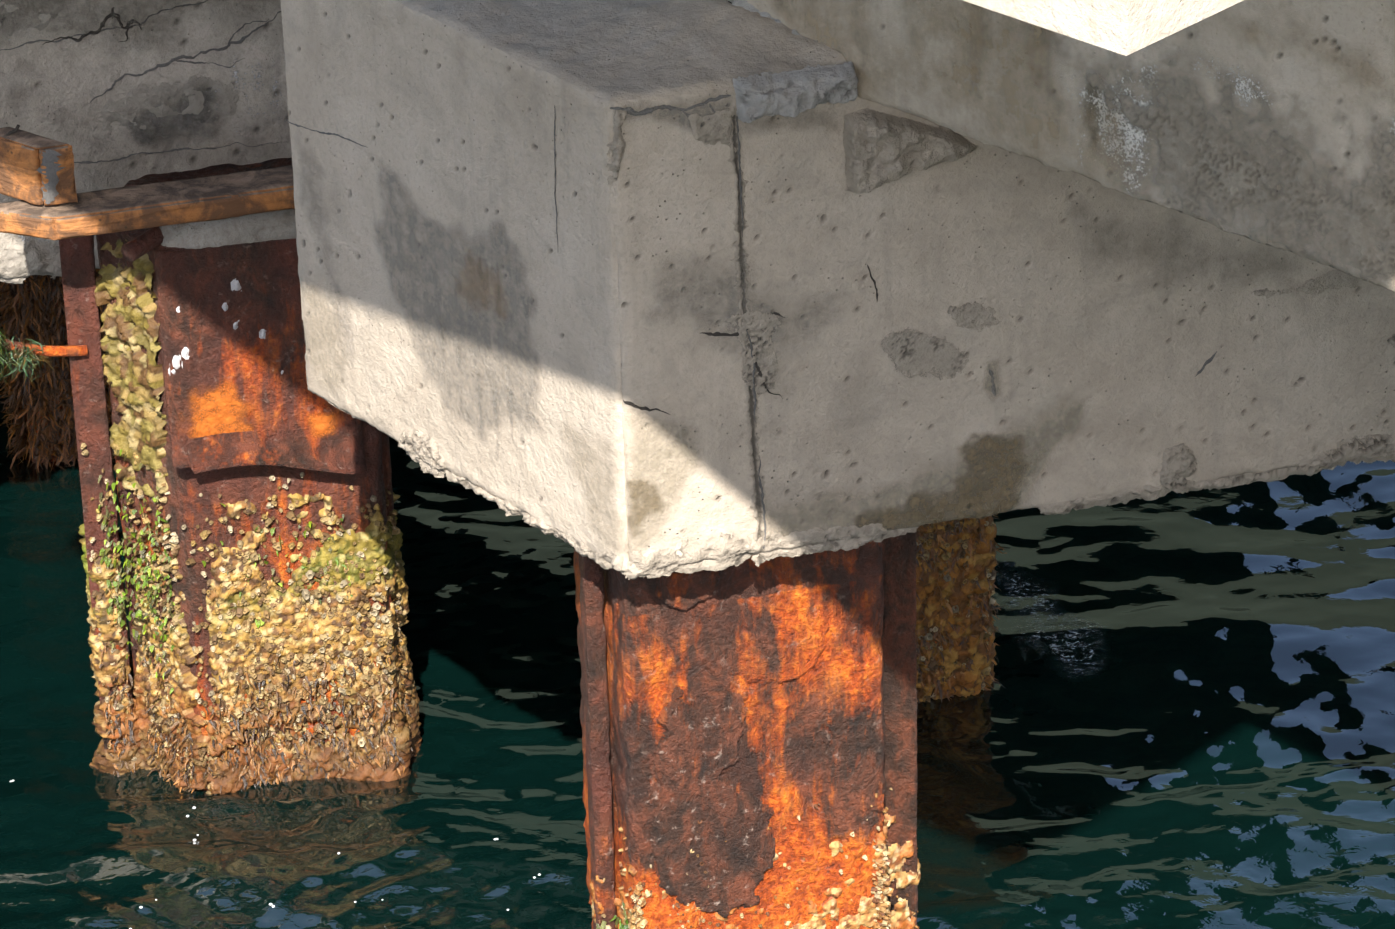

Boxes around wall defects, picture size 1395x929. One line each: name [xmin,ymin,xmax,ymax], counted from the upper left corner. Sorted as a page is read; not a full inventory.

crack [1,0,281,103]
spalling [843,108,977,194]
water stain [941,16,1168,196]
spalling [1038,430,1395,515]